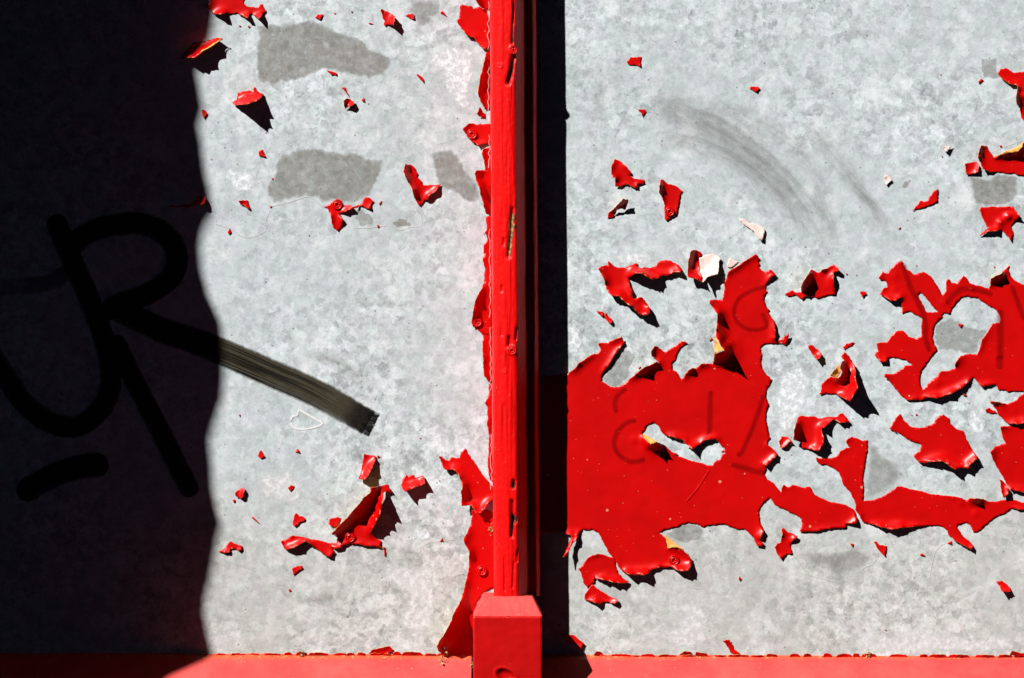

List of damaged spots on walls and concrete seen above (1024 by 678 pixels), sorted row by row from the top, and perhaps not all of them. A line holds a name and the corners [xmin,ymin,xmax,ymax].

peeling [205,0,266,27]
peeling [181,38,223,59]
peeling [998,68,1024,121]
peeling [965,143,1024,175]
peeling [608,159,645,218]
peeling [659,179,683,221]
peeling [979,206,1020,241]
peeling [216,0,494,656]
peeling [539,250,1024,604]